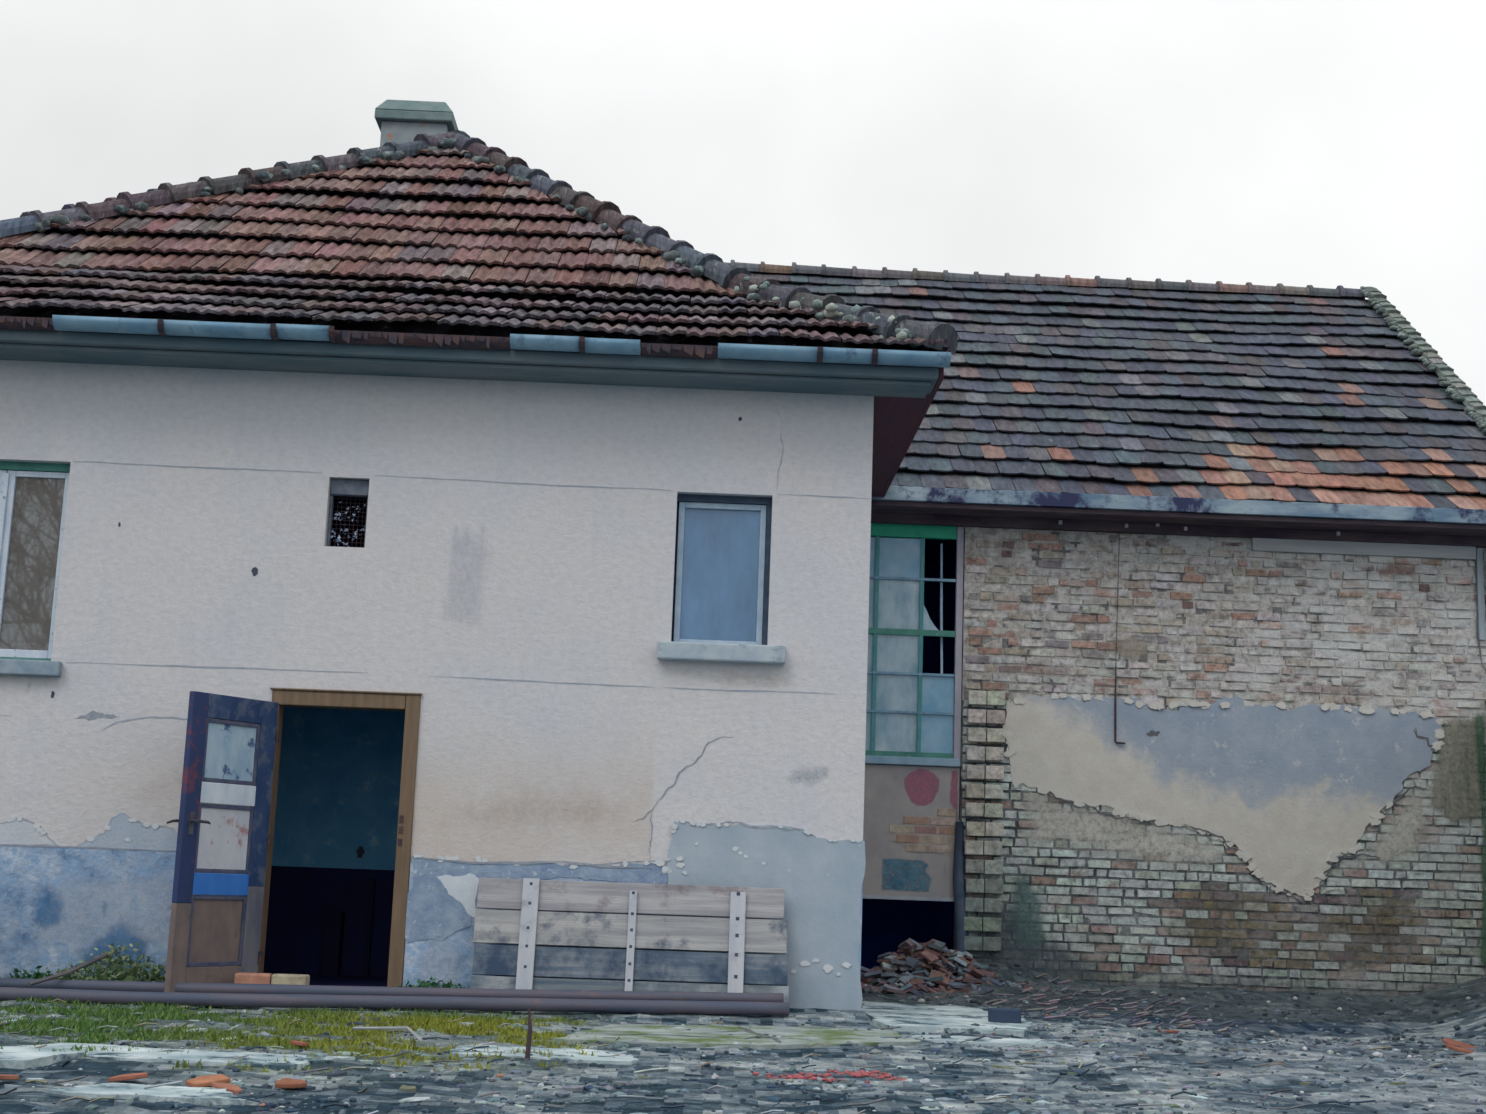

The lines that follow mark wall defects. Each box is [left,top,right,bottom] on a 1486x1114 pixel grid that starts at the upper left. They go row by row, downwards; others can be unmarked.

crack [65,662,367,673]
crack [435,676,832,694]
peeling [0,813,178,850]
crack [420,736,732,869]
peeling [1002,693,1447,901]
peeling [405,819,866,1011]